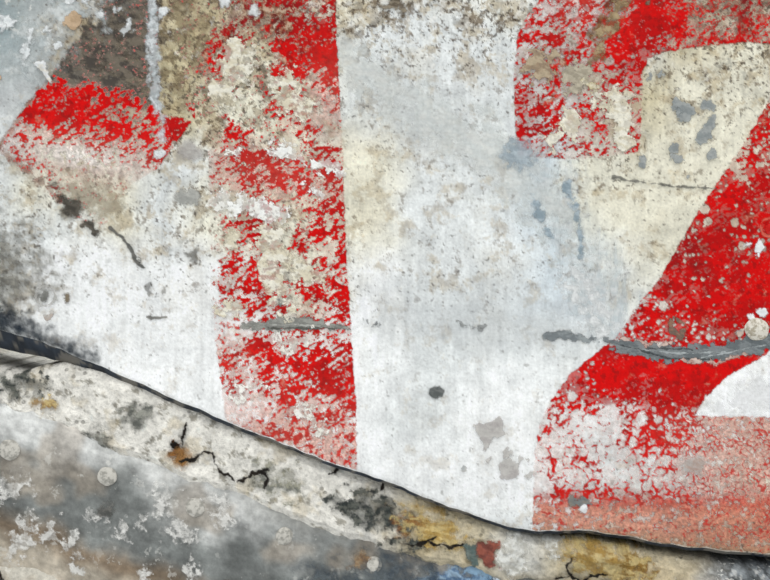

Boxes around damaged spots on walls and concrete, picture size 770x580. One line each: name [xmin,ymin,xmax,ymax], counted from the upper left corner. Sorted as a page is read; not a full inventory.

peeling [207,31,263,114]
peeling [267,63,320,124]
peeling [671,97,717,160]
peeling [265,137,347,200]
peeling [206,185,326,362]
peeling [744,239,765,257]
peeling [620,316,686,348]
peeling [680,352,748,366]
peeling [747,308,768,320]
peeling [293,402,330,437]
corrosion [168,440,190,466]
crack [179,422,269,489]